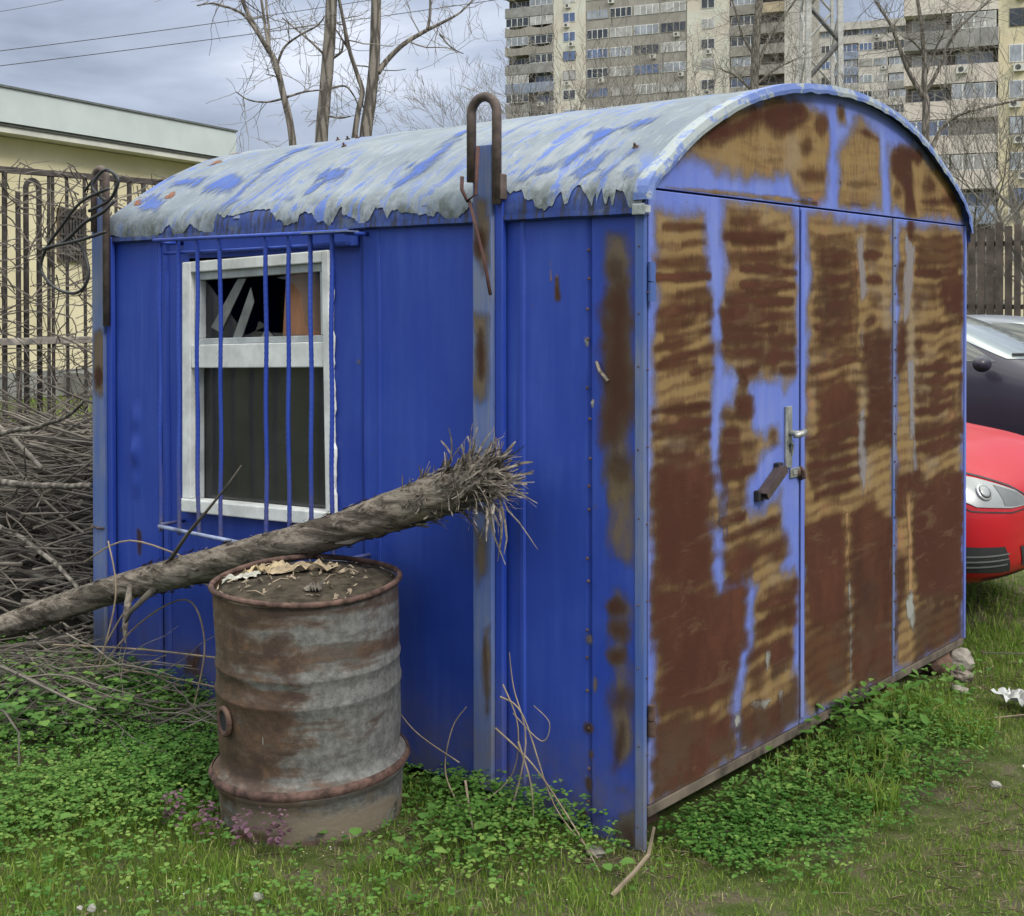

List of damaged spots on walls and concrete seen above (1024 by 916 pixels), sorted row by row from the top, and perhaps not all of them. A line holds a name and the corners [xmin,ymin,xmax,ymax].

peeling [110,89,756,237]
rust [474,199,489,269]
rust [473,314,488,401]
rust [600,234,635,561]
rust [649,95,964,805]
rust [606,594,632,761]